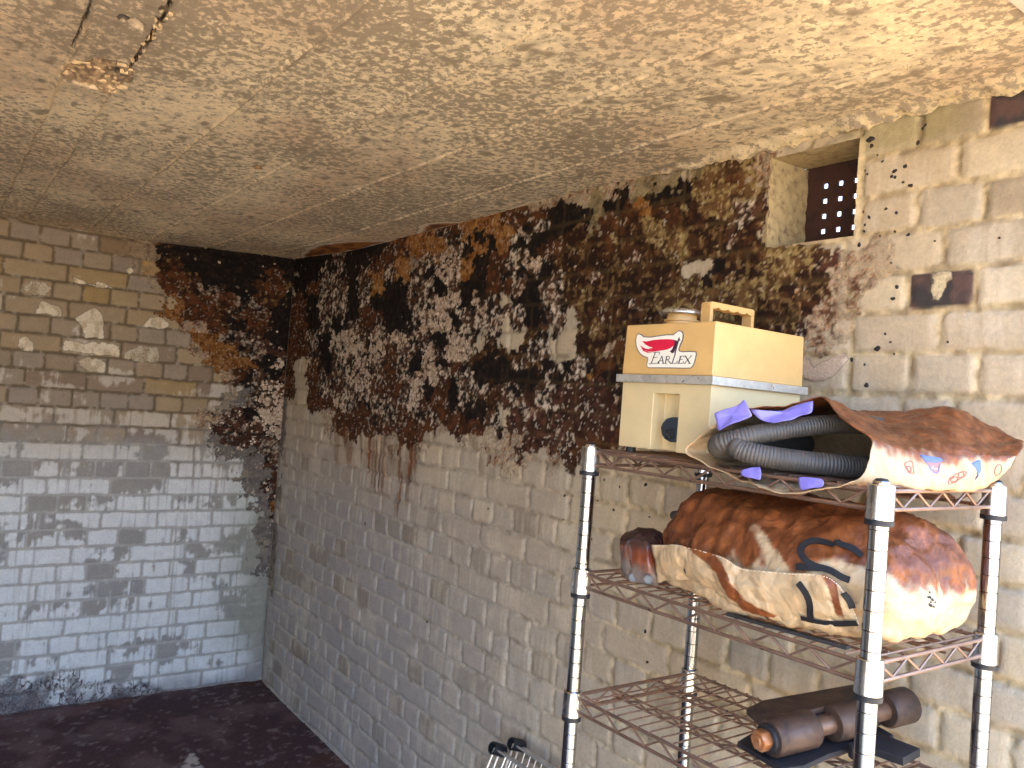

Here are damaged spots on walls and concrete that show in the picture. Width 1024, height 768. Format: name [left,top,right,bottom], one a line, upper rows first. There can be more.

crack [72,4,91,45]
crack [127,0,173,69]
spalling [60,57,133,95]
peeling [24,281,62,316]
peeling [73,277,112,288]
peeling [18,336,34,352]
peeling [63,308,159,373]
peeling [143,317,169,329]
damp [127,151,844,597]